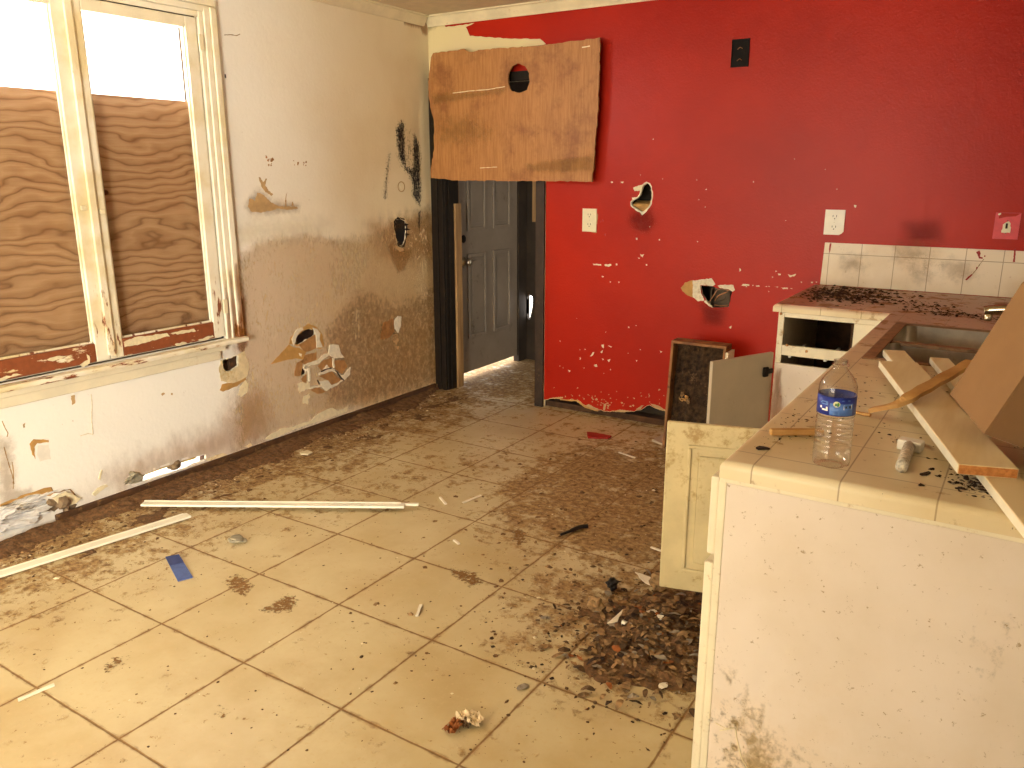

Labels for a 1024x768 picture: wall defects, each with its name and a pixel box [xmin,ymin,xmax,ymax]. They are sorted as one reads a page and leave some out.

peeling [248,177,298,213]
spalling [611,181,653,215]
spalling [394,217,410,252]
spalling [681,271,817,308]
peeling [124,329,214,347]
flaking render [271,324,351,404]
peeling [553,387,665,412]
flaking render [0,487,81,537]